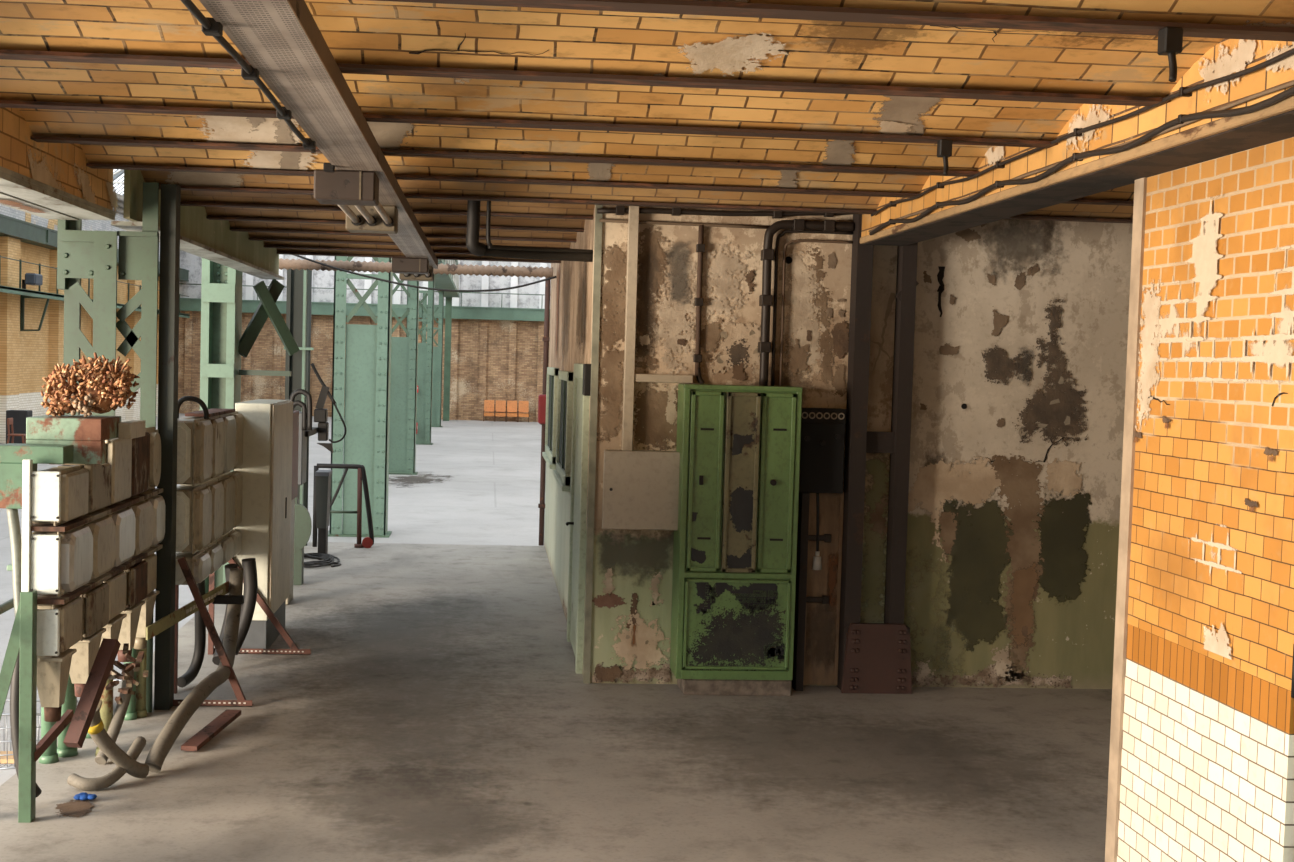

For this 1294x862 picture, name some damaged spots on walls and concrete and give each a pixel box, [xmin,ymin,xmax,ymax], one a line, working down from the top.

flaking render [678,32,788,77]
flaking render [873,96,941,136]
flaking render [955,224,986,242]
flaking render [1014,264,1039,290]
flaking render [597,224,761,451]
flaking render [908,299,1089,688]